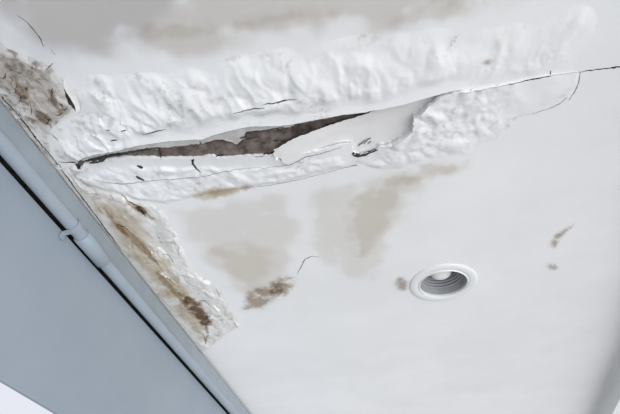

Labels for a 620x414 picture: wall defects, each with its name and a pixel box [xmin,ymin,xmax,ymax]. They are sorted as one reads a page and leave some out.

crack [461,66,620,114]
flaking render [115,111,371,158]
leakage [185,297,211,325]